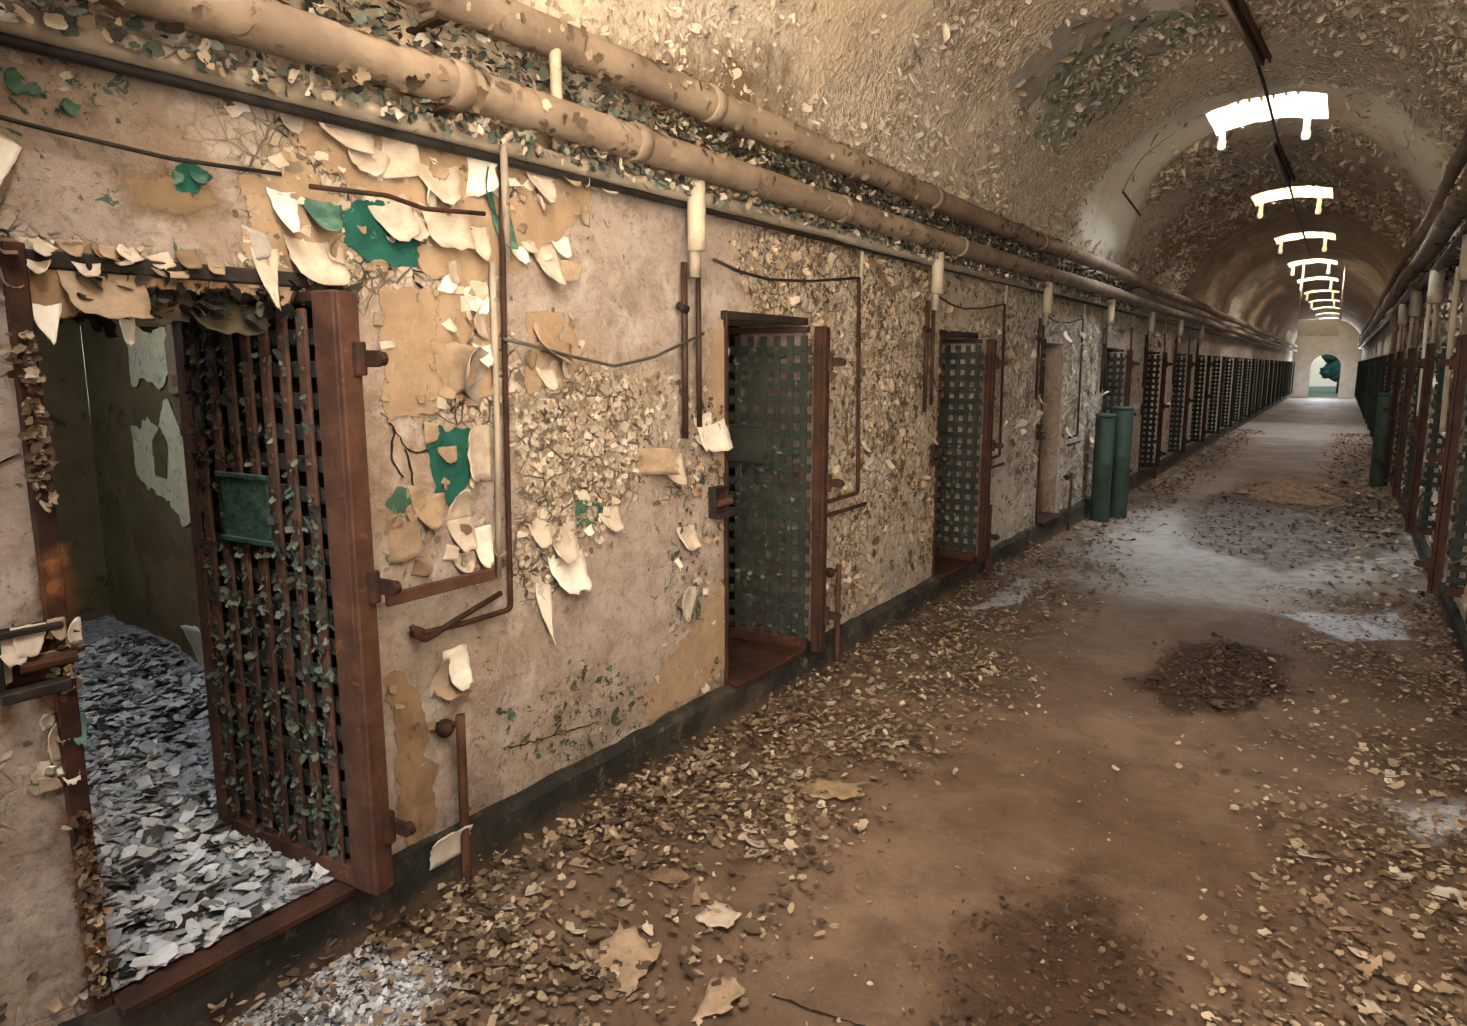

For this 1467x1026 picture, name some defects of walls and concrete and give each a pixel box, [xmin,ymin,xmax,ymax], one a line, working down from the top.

peeling [221,98,257,136]
peeling [0,134,22,185]